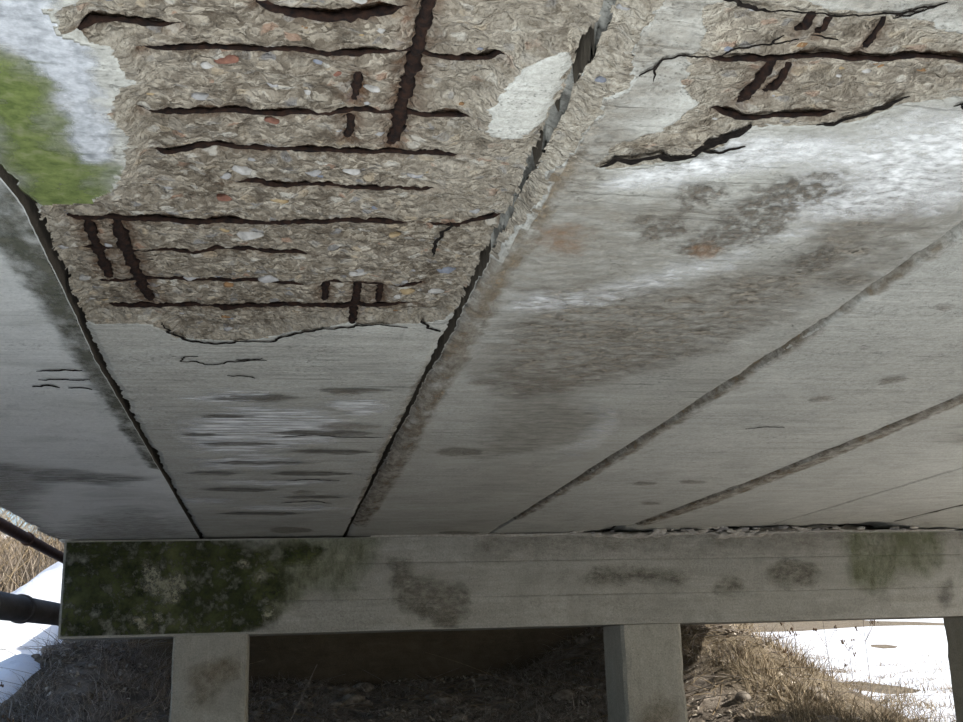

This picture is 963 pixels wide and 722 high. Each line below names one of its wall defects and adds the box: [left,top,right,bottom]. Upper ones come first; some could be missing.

leakage [0,0,110,163]
spalling [595,0,963,169]
spalling [36,0,665,341]
crack [432,222,454,256]
efflorescence [617,121,963,214]
leakage [185,389,382,515]